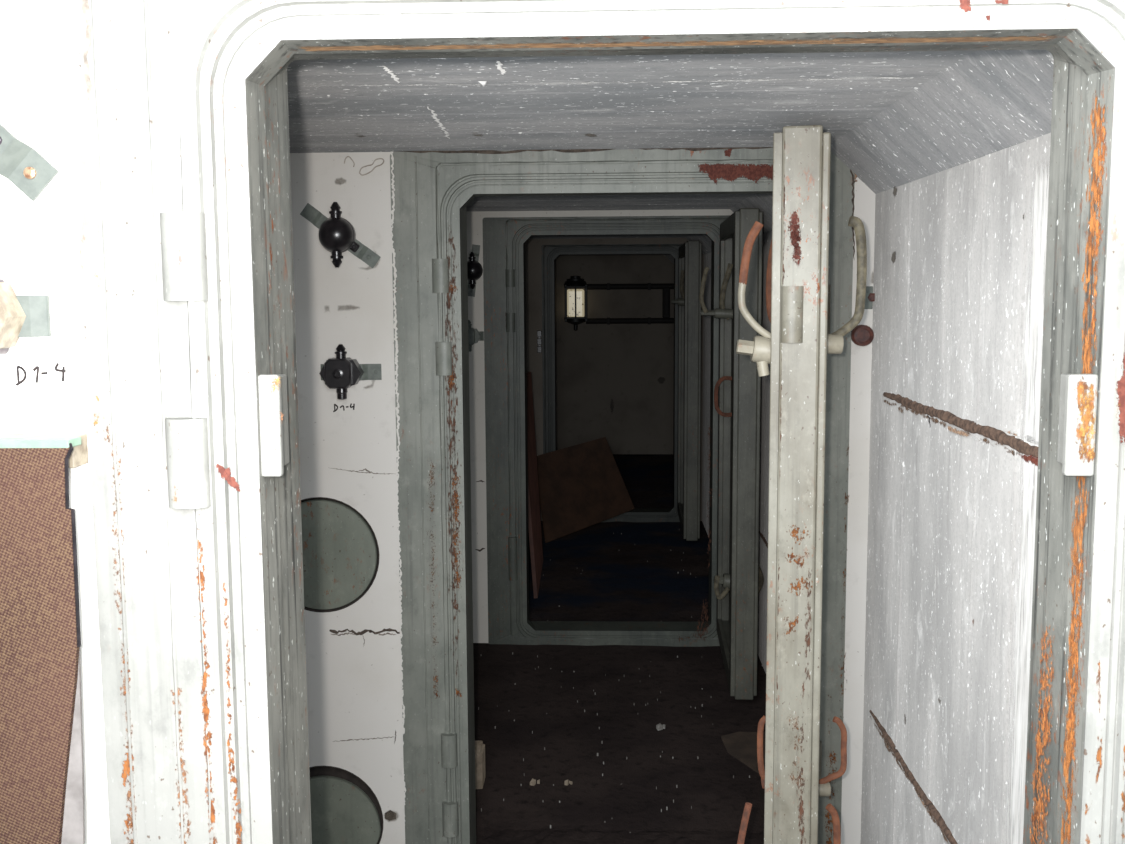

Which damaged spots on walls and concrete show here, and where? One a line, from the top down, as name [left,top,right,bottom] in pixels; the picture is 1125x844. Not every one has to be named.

rust [698,149,801,284]
rust [1076,92,1108,462]
rust [94,415,126,614]
rust [427,233,462,697]
rust [1117,355,1125,443]
rust [120,645,137,844]
rust [196,528,217,844]
rust [226,643,242,844]
crack [329,628,400,644]
rust [1029,476,1089,844]